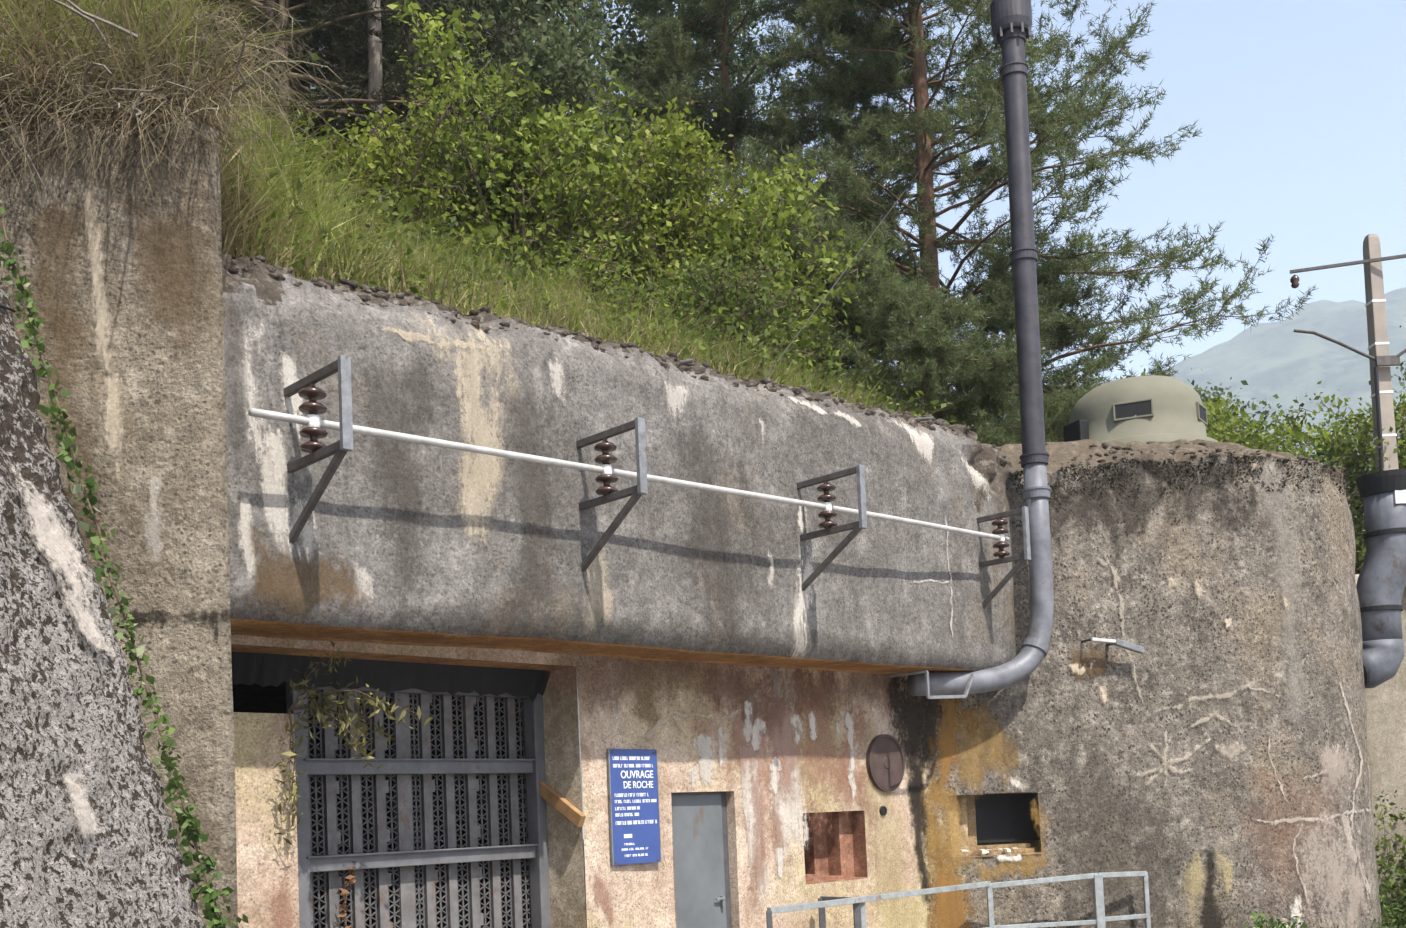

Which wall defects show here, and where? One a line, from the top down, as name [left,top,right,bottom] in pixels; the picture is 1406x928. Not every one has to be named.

flaking render [11,468,113,654]
rust [730,669,878,890]
leakage [888,674,945,902]
rust [926,698,1045,928]
leakage [1200,849,1224,928]
crack [1097,555,1372,920]